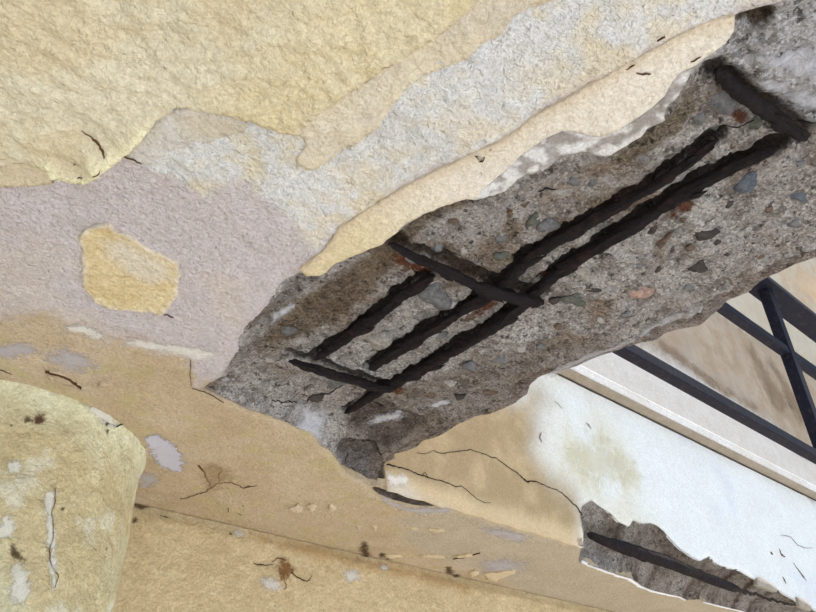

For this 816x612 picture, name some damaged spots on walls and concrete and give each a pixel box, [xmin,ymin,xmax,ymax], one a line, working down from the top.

peeling [0,0,552,188]
rust [713,67,811,143]
peeling [79,222,181,316]
spalling [204,0,816,514]
rust [288,138,781,414]
flaking render [144,434,185,472]
crack [180,465,255,515]
crack [387,449,583,516]
rust [587,531,738,592]
spalling [579,501,816,612]